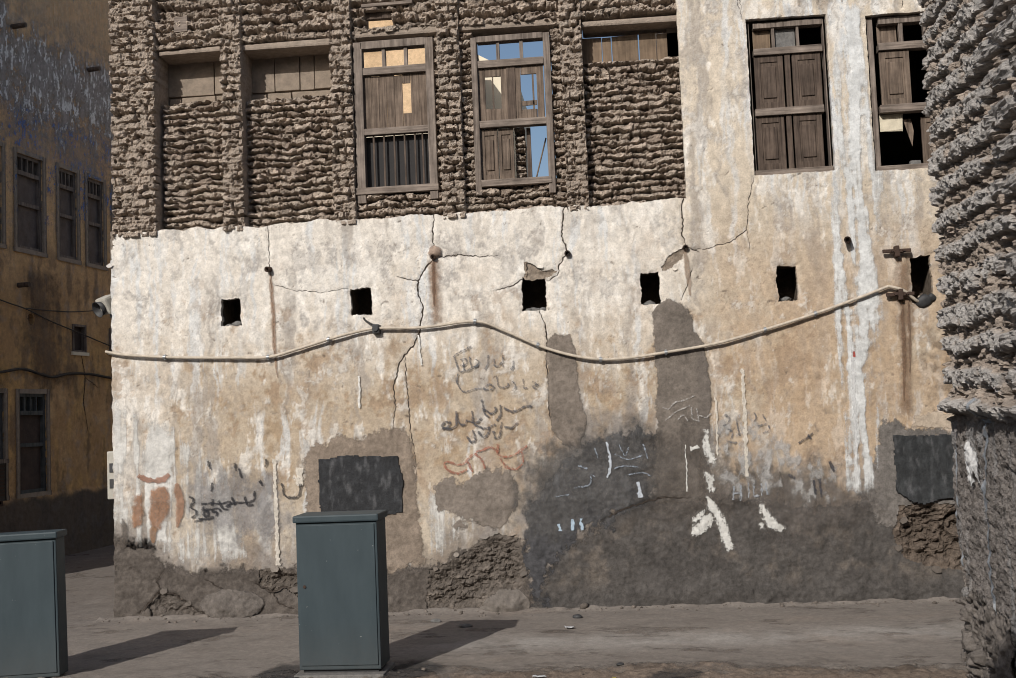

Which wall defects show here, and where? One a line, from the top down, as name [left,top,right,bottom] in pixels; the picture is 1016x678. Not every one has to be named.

crack [393,213,498,482]
spalling [522,262,557,281]
spalling [661,248,685,271]
crack [681,178,754,300]
leakage [477,0,965,609]
rust [899,264,911,410]
spalling [148,588,205,616]
leakage [112,401,298,618]
spalling [259,567,298,595]
leakage [387,494,466,612]
spalling [425,532,527,609]
spalling [892,503,962,573]